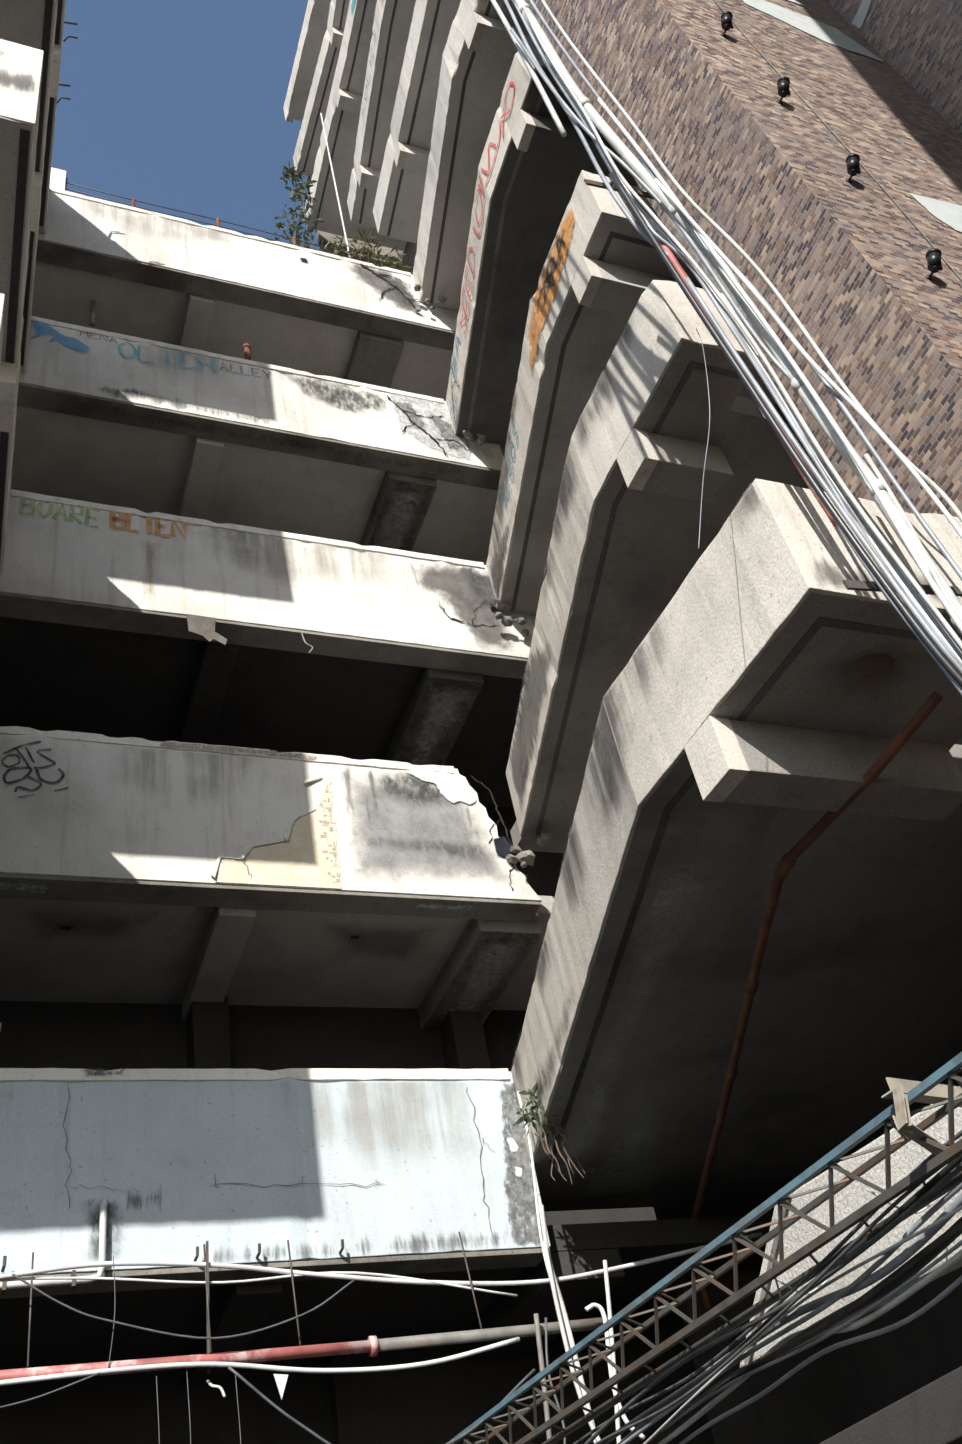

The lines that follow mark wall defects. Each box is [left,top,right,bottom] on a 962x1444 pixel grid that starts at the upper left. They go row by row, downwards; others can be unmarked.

spalling [391,389,487,459]
spalling [488,596,529,637]
water stain [344,678,511,873]
peeling [406,770,476,804]
crack [63,1088,141,1211]
crack [212,1174,386,1188]
crack [466,1086,496,1244]
spalling [501,1083,543,1244]
water stain [91,1205,114,1257]
water stain [396,1234,466,1252]